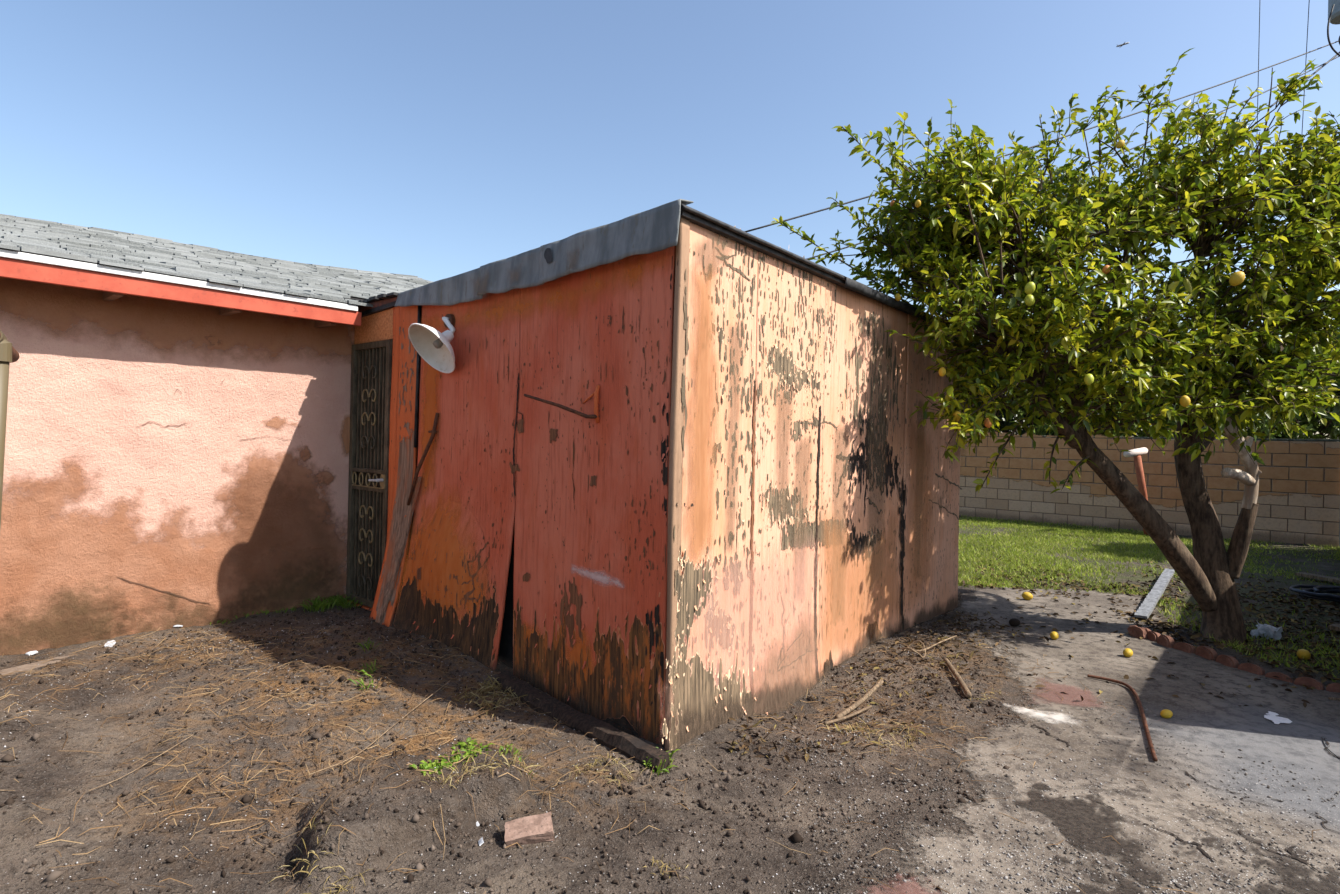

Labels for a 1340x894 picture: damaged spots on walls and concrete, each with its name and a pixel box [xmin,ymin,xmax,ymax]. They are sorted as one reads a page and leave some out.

water stain [0,446,347,656]
water stain [266,417,293,429]
peeling [376,324,520,625]
peeling [553,577,586,648]
water stain [389,501,962,751]
peeling [590,226,959,730]